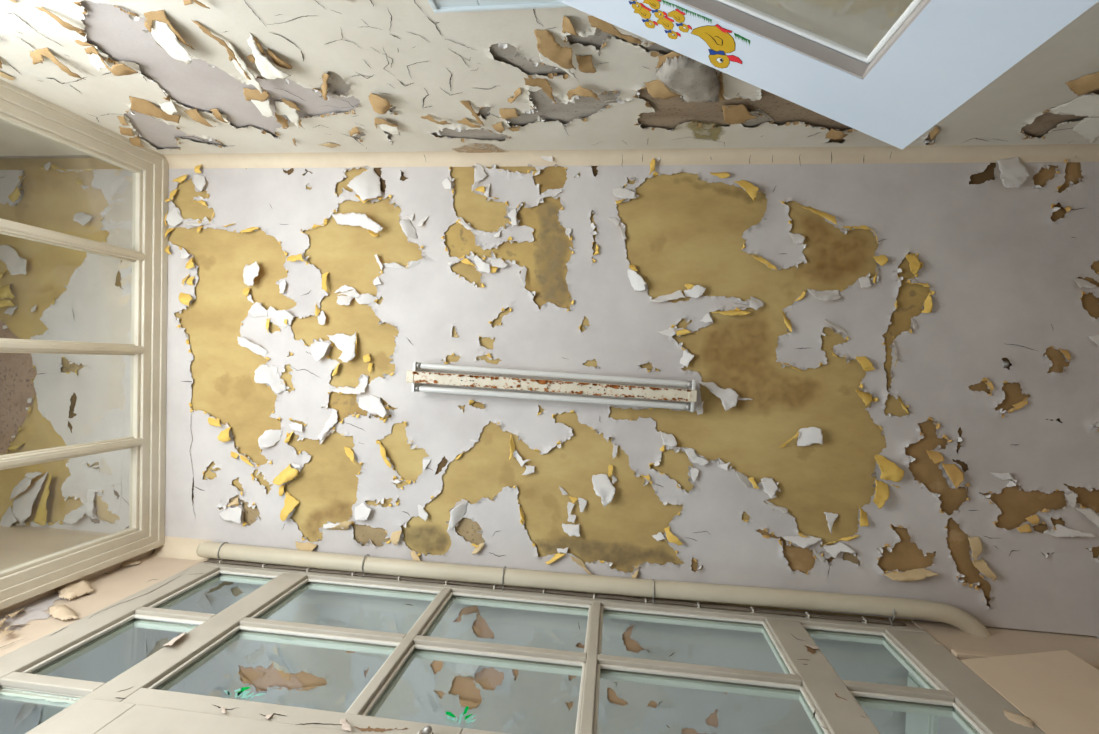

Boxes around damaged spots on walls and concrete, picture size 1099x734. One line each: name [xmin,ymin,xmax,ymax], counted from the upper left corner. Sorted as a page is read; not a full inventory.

spalling [29,0,400,150]
crack [244,0,501,149]
spalling [421,16,858,143]
spalling [924,126,939,145]
spalling [1020,71,1099,144]
peeling [165,156,1099,607]